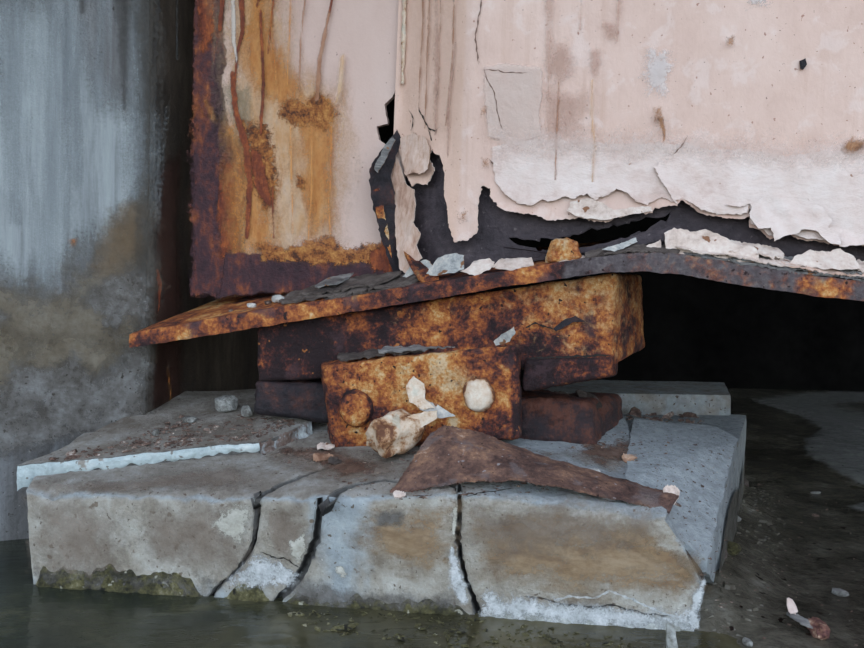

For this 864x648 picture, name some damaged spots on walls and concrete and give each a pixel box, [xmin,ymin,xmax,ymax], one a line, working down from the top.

leakage [0,0,161,390]
corrosion [150,0,439,325]
peeling [392,132,534,277]
peeling [492,138,864,270]
corrosion [579,223,864,282]
corrosion [151,340,181,405]
corrosion [337,344,455,362]
corrosion [526,316,586,331]
leakage [152,508,232,562]
crack [207,461,398,601]
crack [449,484,513,615]